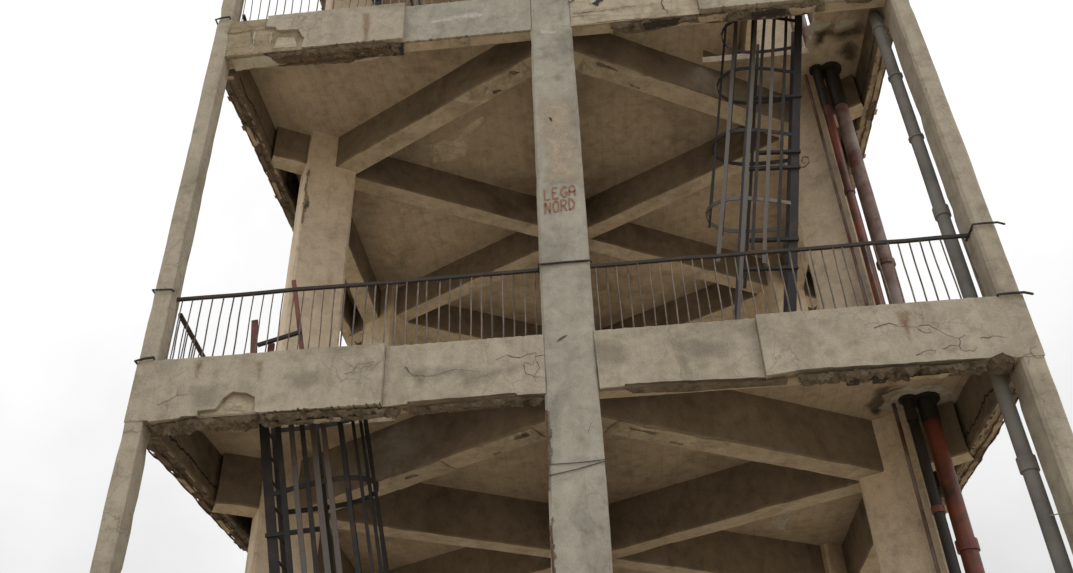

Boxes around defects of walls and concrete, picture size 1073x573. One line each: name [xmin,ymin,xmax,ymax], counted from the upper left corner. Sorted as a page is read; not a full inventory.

spalling [569,0,856,49]
spalling [225,20,404,231]
crack [404,352,541,381]
spalling [622,352,1019,413]
crack [874,323,1001,355]
spalling [147,394,553,553]
flaking render [606,421,726,451]
spalling [956,404,1004,492]